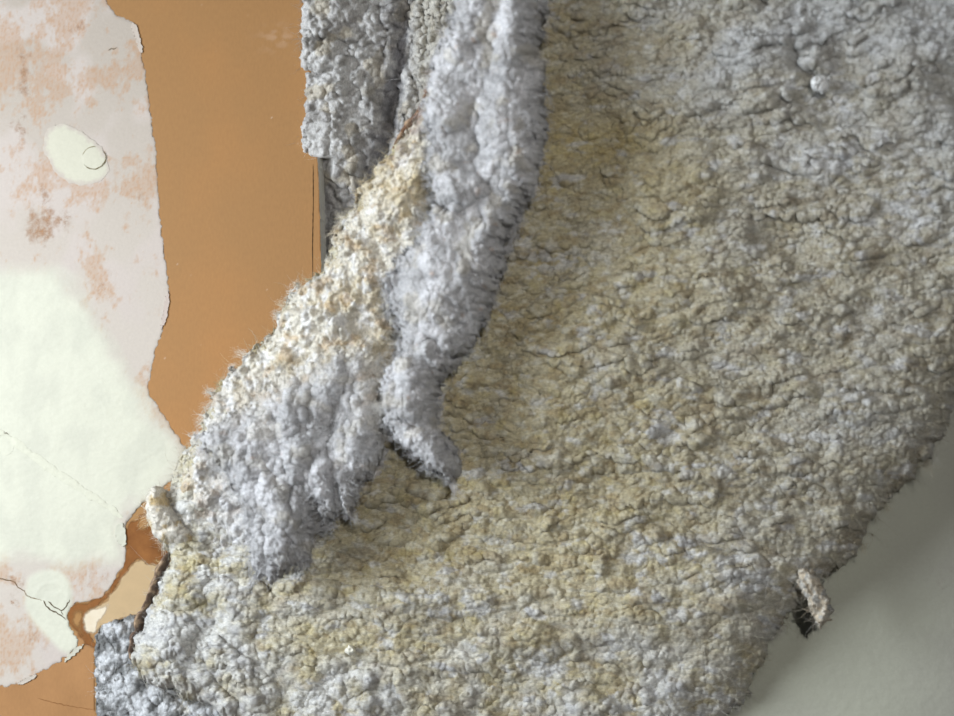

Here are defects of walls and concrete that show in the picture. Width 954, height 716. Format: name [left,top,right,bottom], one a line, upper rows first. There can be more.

peeling [107,0,321,449]
peeling [0,560,156,716]
leakage [68,515,171,647]
peeling [115,523,126,547]